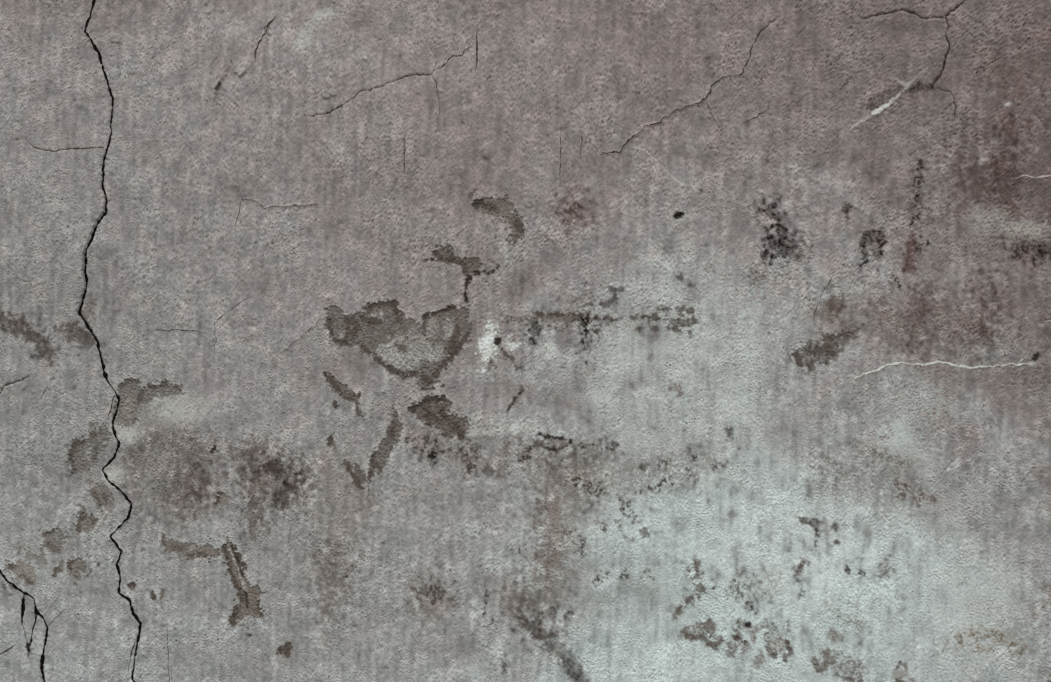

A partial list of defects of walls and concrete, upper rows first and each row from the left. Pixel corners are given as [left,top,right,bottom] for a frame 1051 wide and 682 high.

crack [867,0,1002,122]
crack [28,0,142,682]
crack [0,570,65,682]